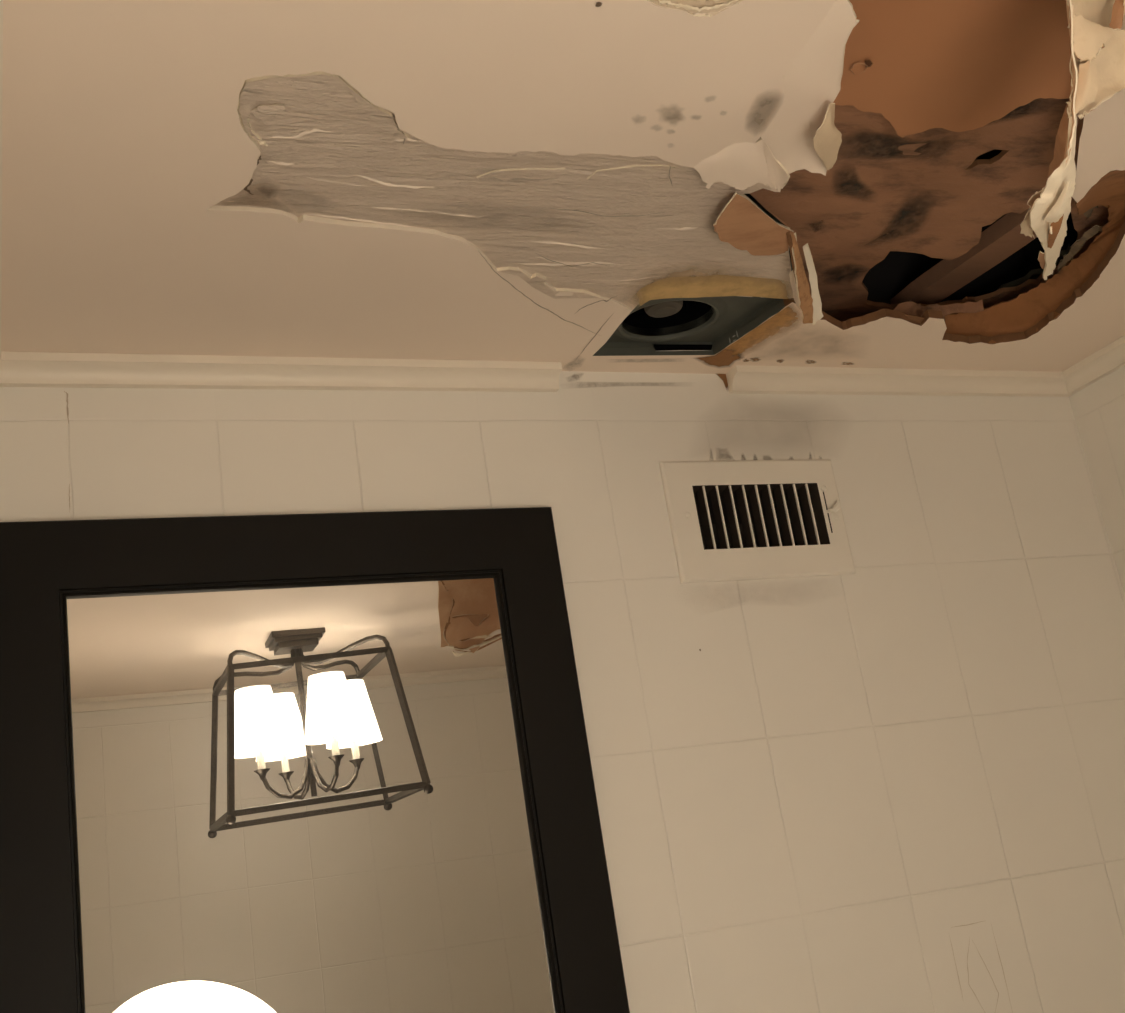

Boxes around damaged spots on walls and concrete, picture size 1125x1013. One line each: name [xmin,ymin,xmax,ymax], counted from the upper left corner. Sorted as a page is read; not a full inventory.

flaking render [649,0,742,17]
water stain [638,271,787,306]